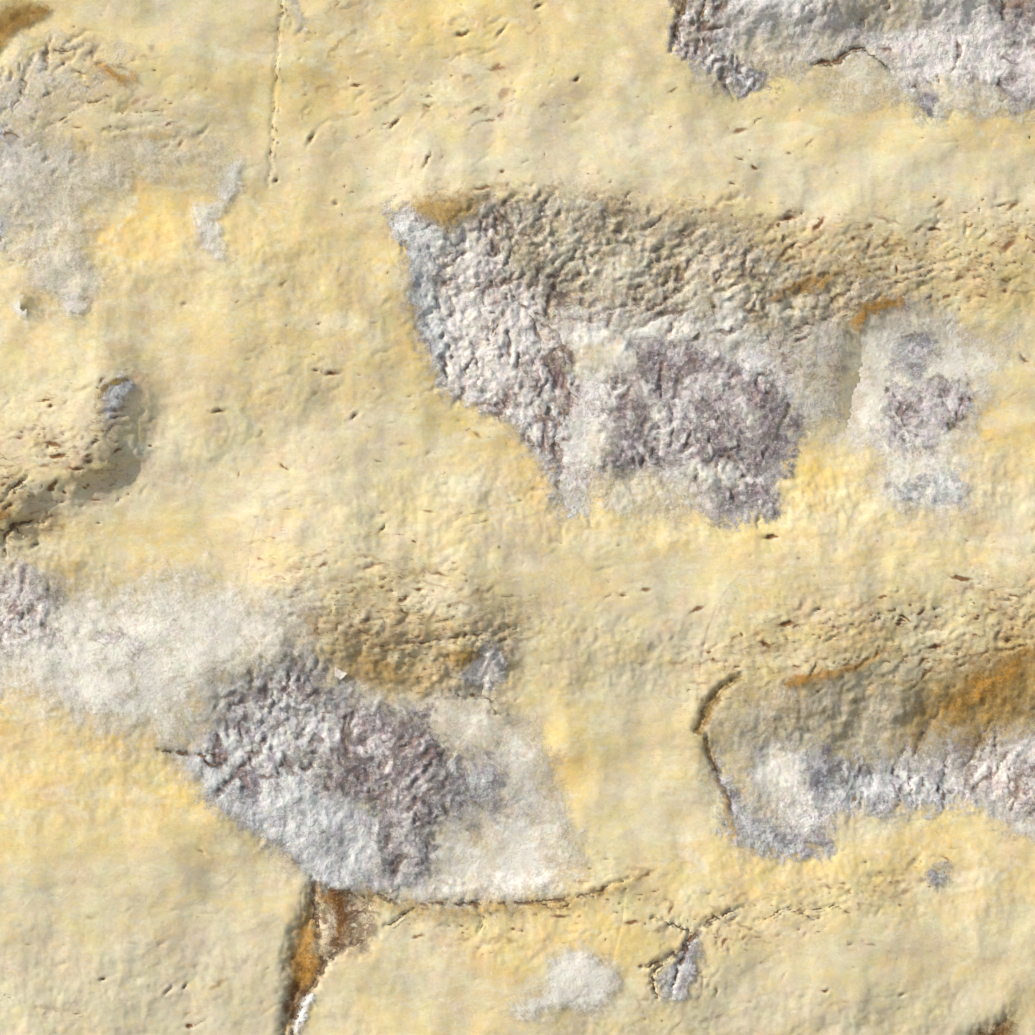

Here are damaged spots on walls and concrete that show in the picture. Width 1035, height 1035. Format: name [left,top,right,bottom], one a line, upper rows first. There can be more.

rust [0,0,49,48]
water stain [0,555,319,744]
crack [705,734,733,813]
rust [282,884,420,1033]
crack [290,879,624,1035]
crack [645,905,839,997]
rust [979,1019,1013,1035]